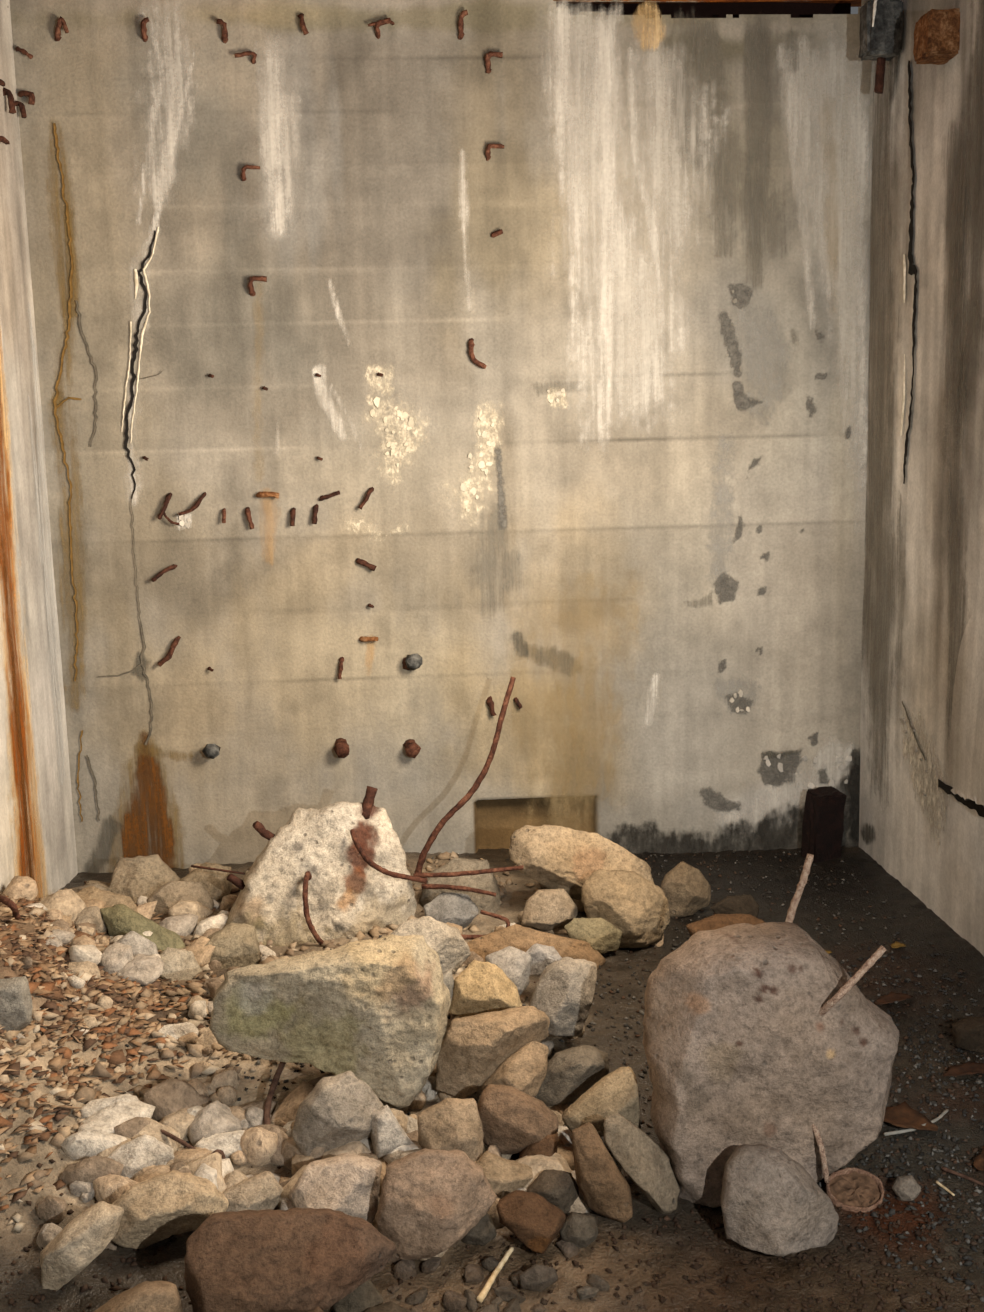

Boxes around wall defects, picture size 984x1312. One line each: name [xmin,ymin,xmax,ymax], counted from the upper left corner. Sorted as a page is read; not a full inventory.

water stain [575,19,659,364]
crack [53,123,162,745]
water stain [598,378,610,432]
spalling [695,485,762,606]
corrosion [0,355,47,898]
spalling [717,659,752,714]
crack [77,730,100,822]
corrosion [87,735,183,873]
water stain [611,791,804,854]
spalling [700,788,741,811]
spalling [758,732,852,789]
crack [938,779,984,817]